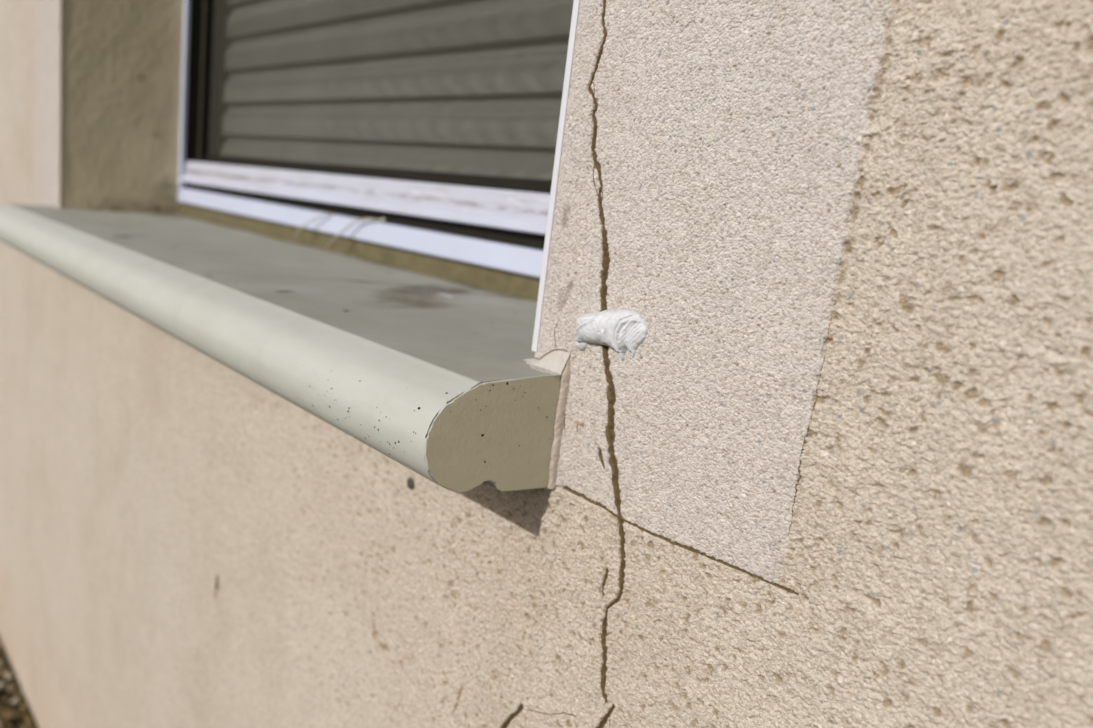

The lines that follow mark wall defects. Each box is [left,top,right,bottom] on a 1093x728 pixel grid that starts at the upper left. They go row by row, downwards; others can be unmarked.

crack [588,0,610,311]
crack [501,345,798,728]